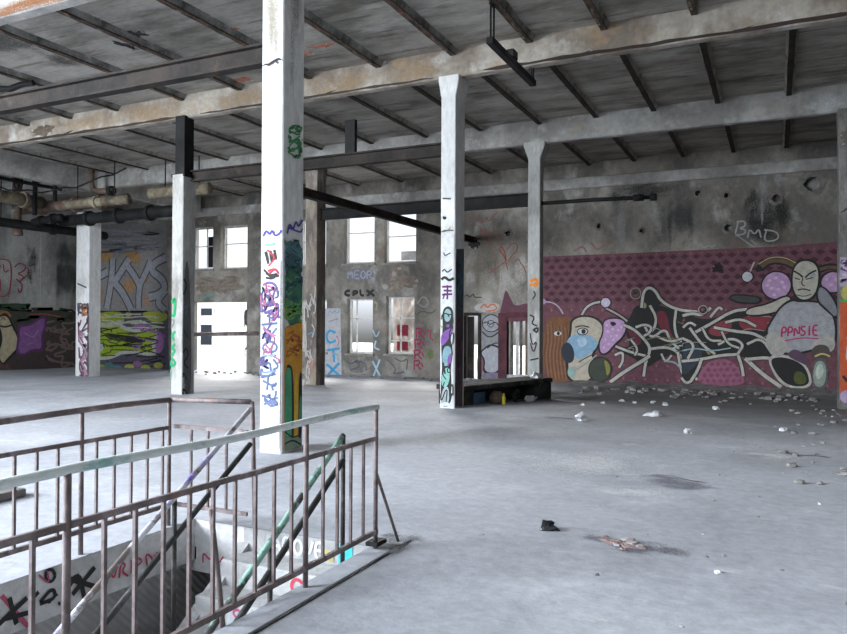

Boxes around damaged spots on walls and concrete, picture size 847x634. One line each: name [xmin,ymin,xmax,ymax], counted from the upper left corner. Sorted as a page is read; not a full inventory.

rust [0,0,59,17]